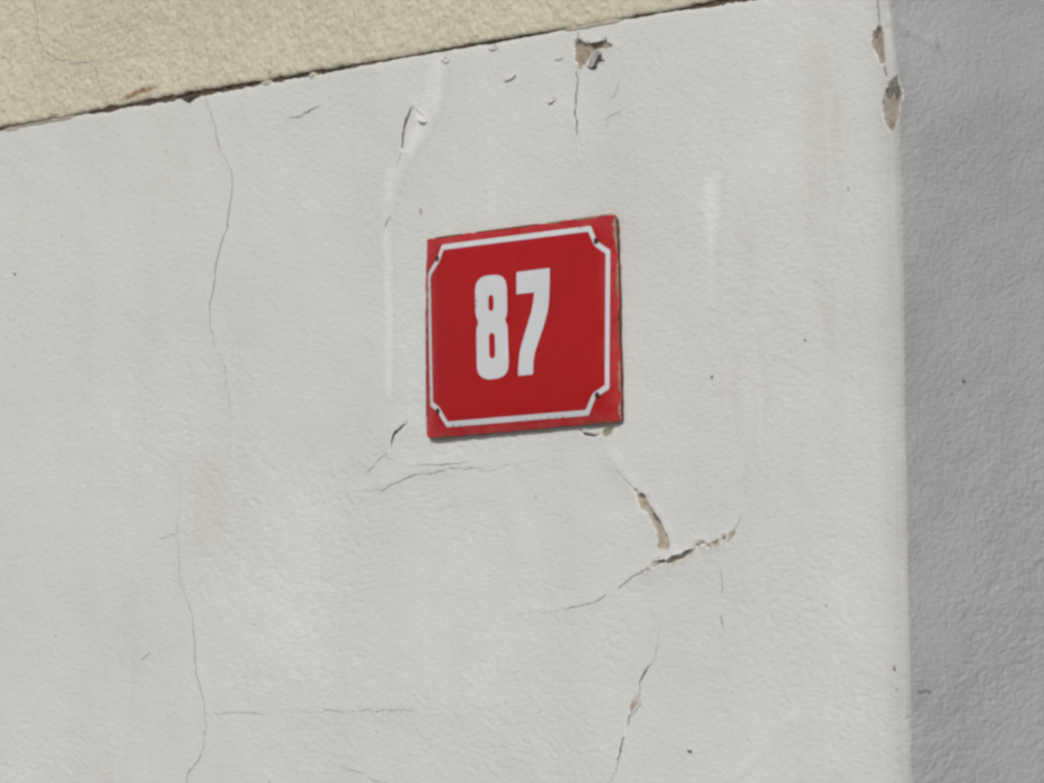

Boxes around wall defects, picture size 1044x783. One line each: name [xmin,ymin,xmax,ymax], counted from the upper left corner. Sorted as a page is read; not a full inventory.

crack [572,70,580,134]
spalling [554,32,613,69]
spalling [871,25,902,131]
crack [205,96,233,402]
crack [366,423,407,473]
crack [580,427,613,437]
spalling [609,460,741,588]
crack [178,566,271,783]
crack [612,641,658,778]